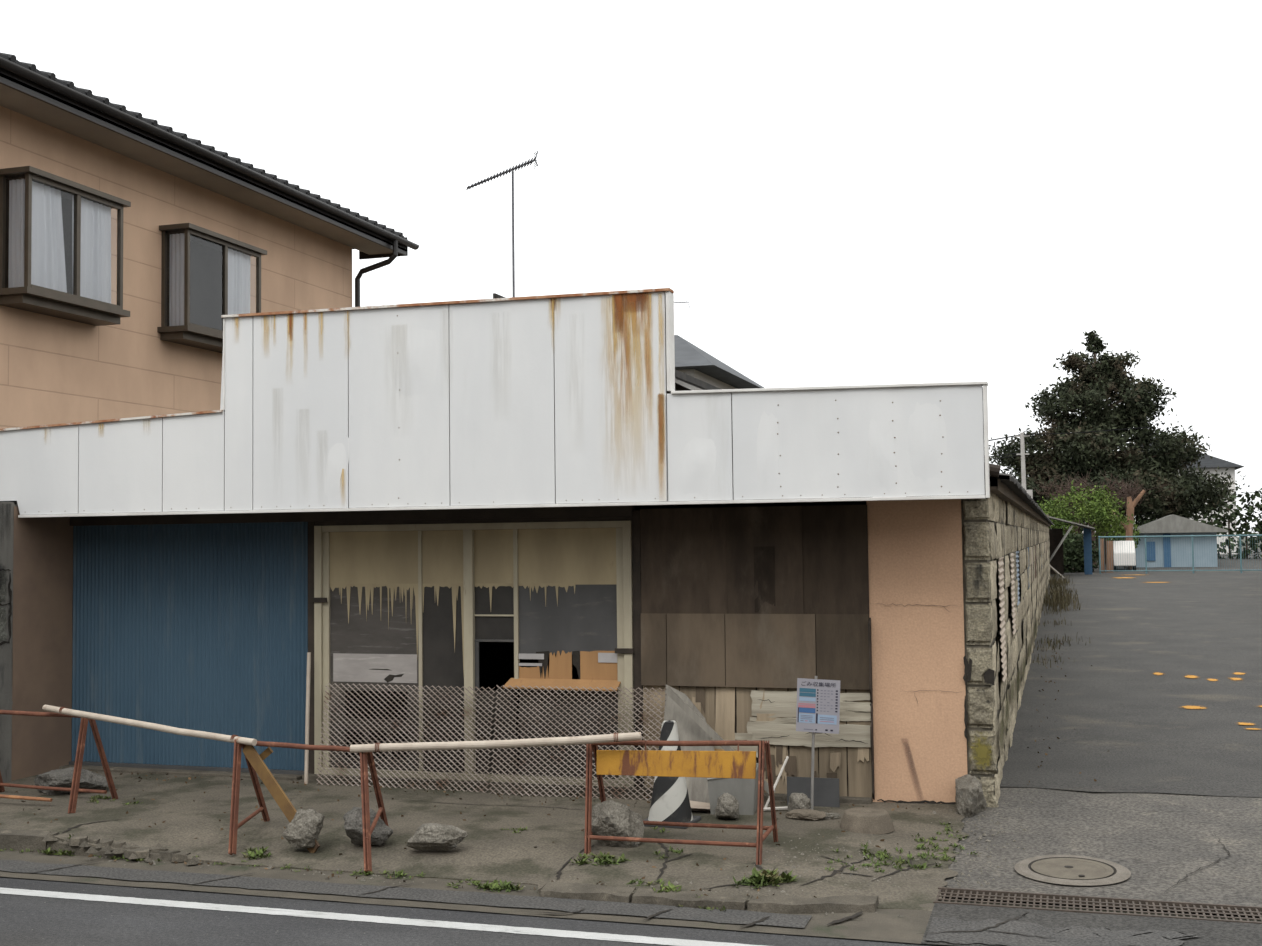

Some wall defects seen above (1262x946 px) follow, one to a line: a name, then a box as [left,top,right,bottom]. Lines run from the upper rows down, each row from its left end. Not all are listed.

corrosion [264,312,323,340]
corrosion [612,292,662,363]